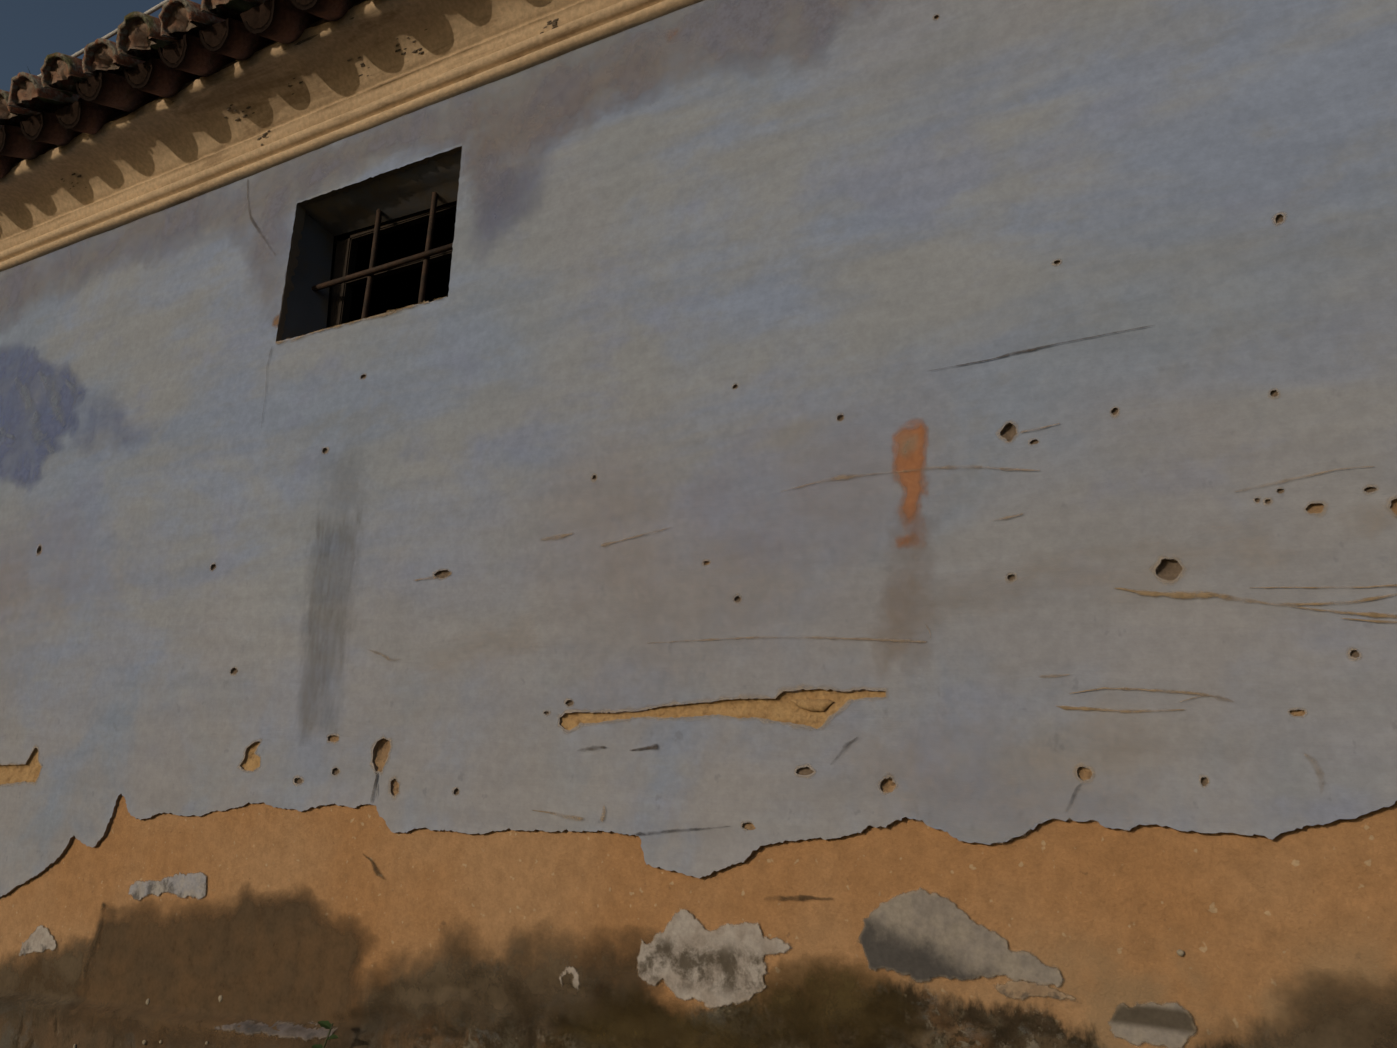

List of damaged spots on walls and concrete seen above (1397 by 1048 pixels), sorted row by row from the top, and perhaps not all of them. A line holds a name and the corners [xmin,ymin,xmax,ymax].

rust [894,425,926,520]
flaking render [0,747,42,786]
flaking render [371,737,399,796]
flaking render [795,765,815,777]
flaking render [880,776,897,794]
flaking render [1076,767,1093,781]